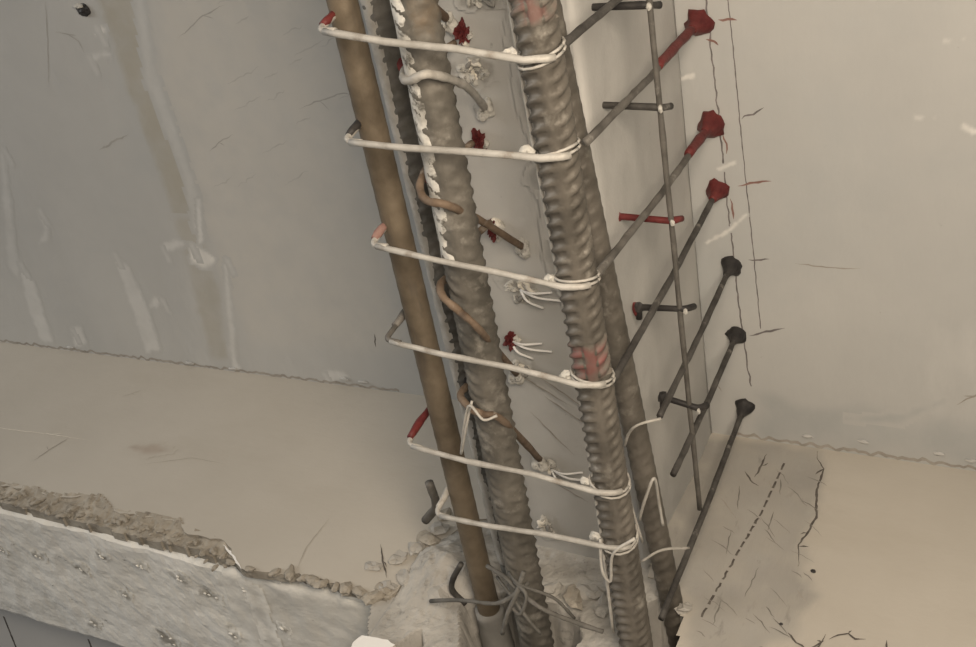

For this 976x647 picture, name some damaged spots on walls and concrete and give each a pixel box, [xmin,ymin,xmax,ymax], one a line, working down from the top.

water stain [90,0,230,363]
flaking render [264,0,837,647]
spalling [0,481,256,579]
spalling [163,568,225,605]
spalling [153,627,181,647]
crack [788,630,859,647]